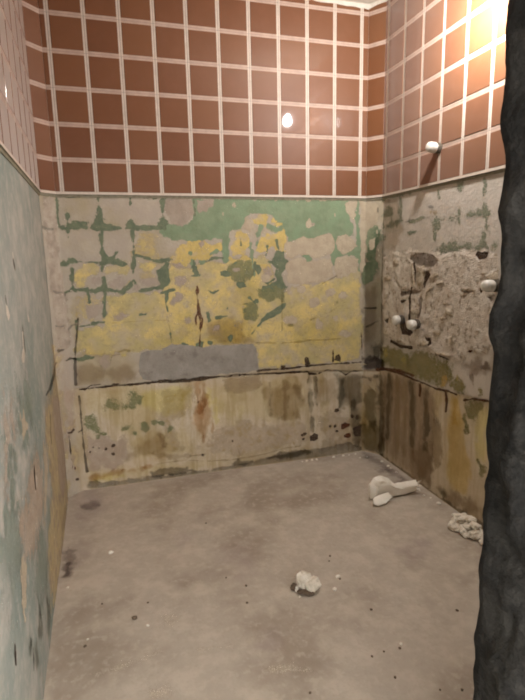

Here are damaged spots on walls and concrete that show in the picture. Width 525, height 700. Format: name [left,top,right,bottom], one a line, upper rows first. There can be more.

damp [155,381,310,459]
peeling [0,176,500,646]
crack [79,333,489,413]
damp [317,407,354,442]